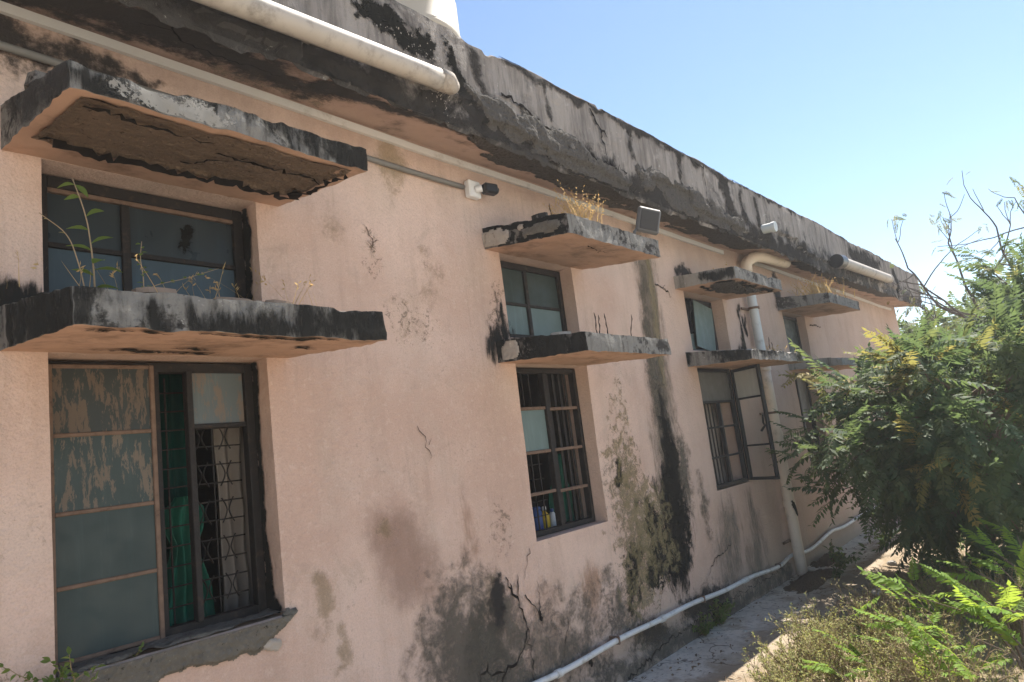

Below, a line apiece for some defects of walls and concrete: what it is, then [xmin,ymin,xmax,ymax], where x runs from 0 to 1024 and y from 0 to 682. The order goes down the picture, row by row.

spalling [31,96,352,200]
water stain [0,0,815,264]
peeling [463,82,762,250]
water stain [0,278,173,347]
water stain [185,209,387,350]
water stain [486,296,588,365]
water stain [636,259,660,339]
water stain [674,263,781,308]
water stain [848,245,900,298]
water stain [418,356,792,682]
peeling [282,607,298,619]
crack [480,548,569,682]